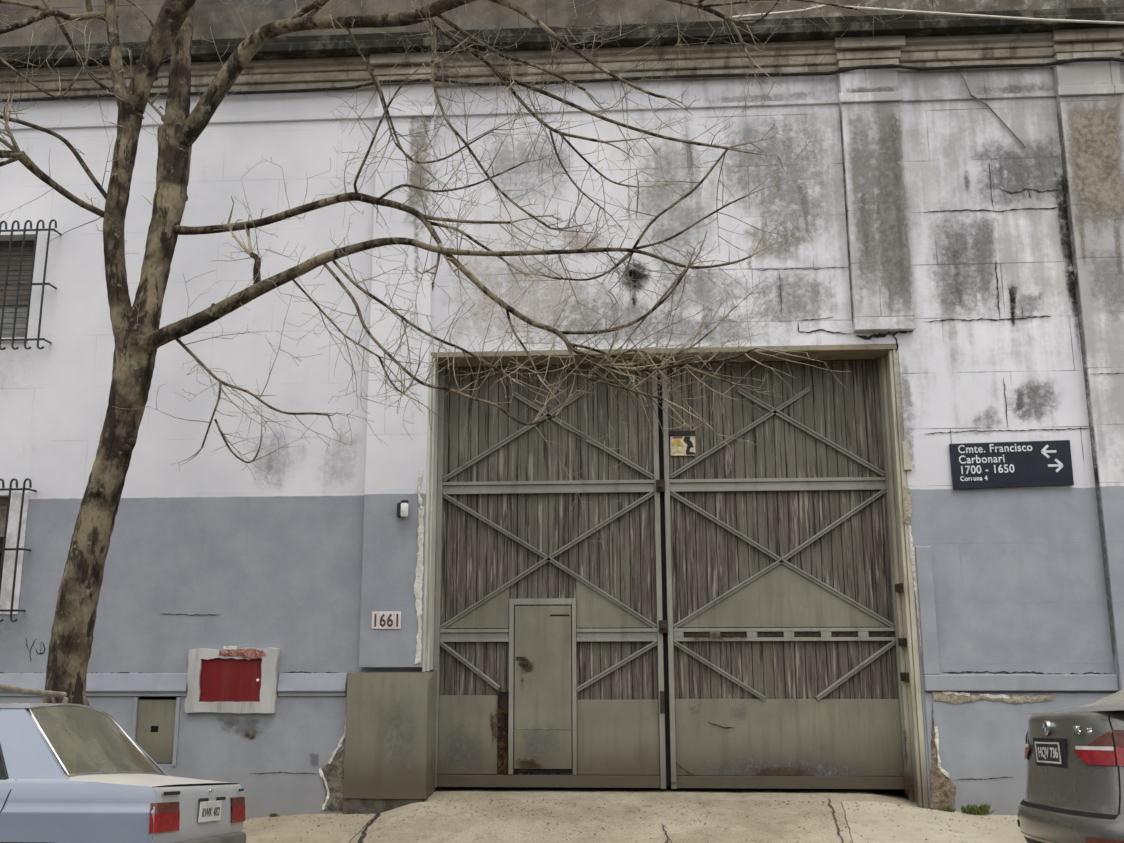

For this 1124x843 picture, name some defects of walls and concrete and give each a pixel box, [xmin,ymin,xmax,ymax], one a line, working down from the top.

damp [728,124,823,256]
damp [840,110,911,322]
crack [924,163,1061,213]
crack [761,259,1051,351]
damp [941,224,993,306]
damp [980,101,1124,653]
spalling [219,646,266,659]
flaking render [319,716,346,811]
rust [490,698,539,772]
flaking render [930,691,1053,810]